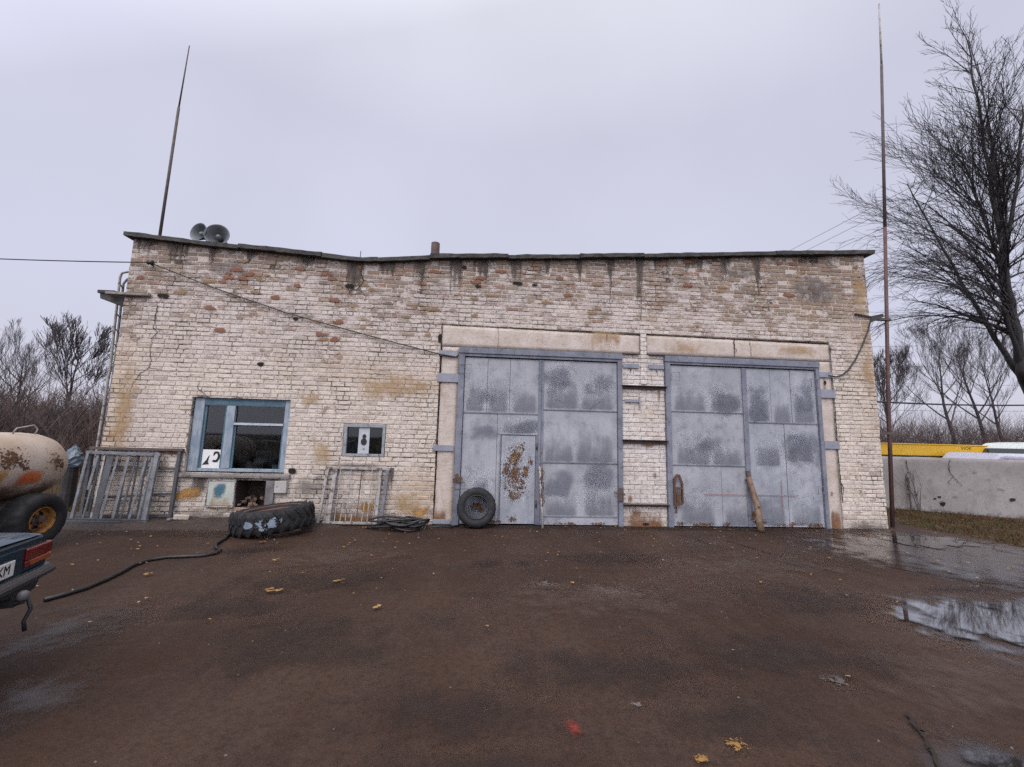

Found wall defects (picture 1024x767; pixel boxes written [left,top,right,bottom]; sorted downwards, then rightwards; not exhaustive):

water stain [347,262,362,294]
water stain [380,262,396,274]
water stain [450,260,488,290]
crack [130,305,170,393]